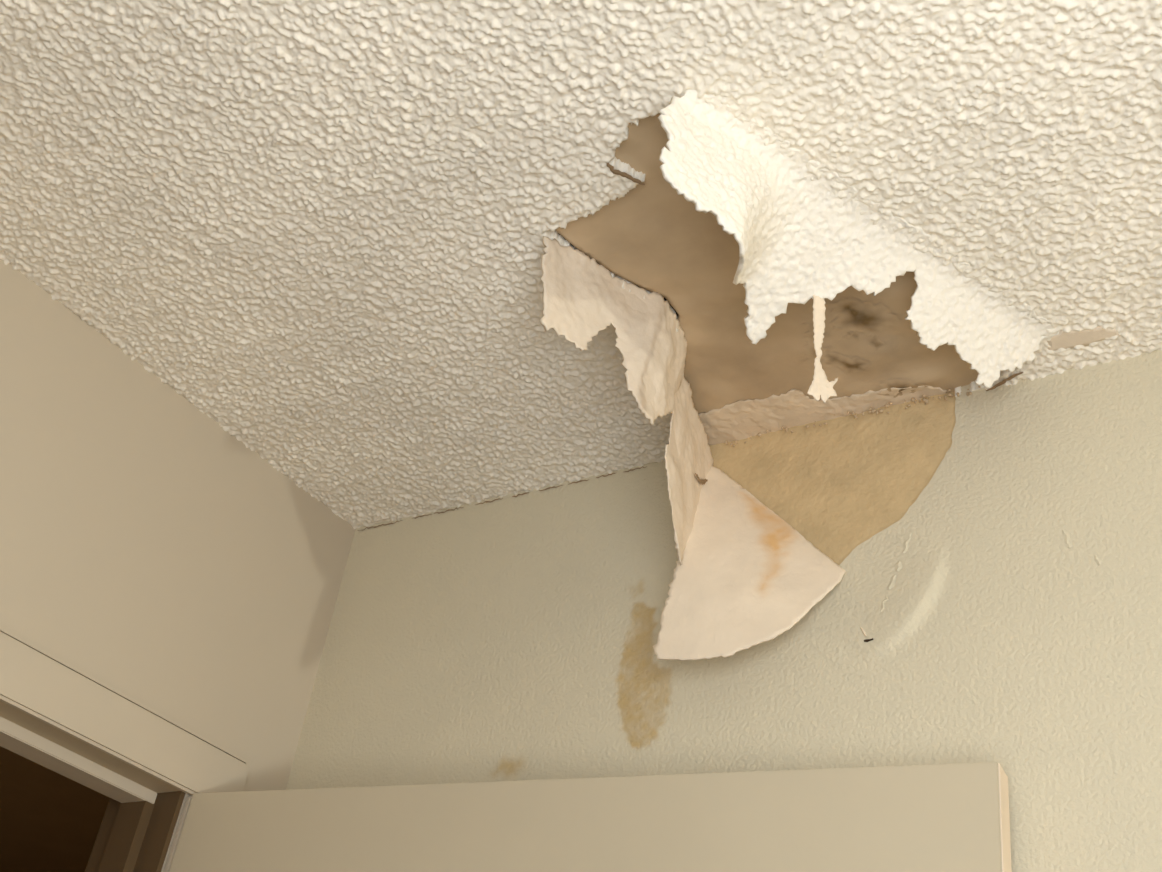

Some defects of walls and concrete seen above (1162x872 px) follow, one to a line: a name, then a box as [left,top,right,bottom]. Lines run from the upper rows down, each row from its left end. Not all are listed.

peeling [539,89,1121,661]
leakage [612,575,675,753]